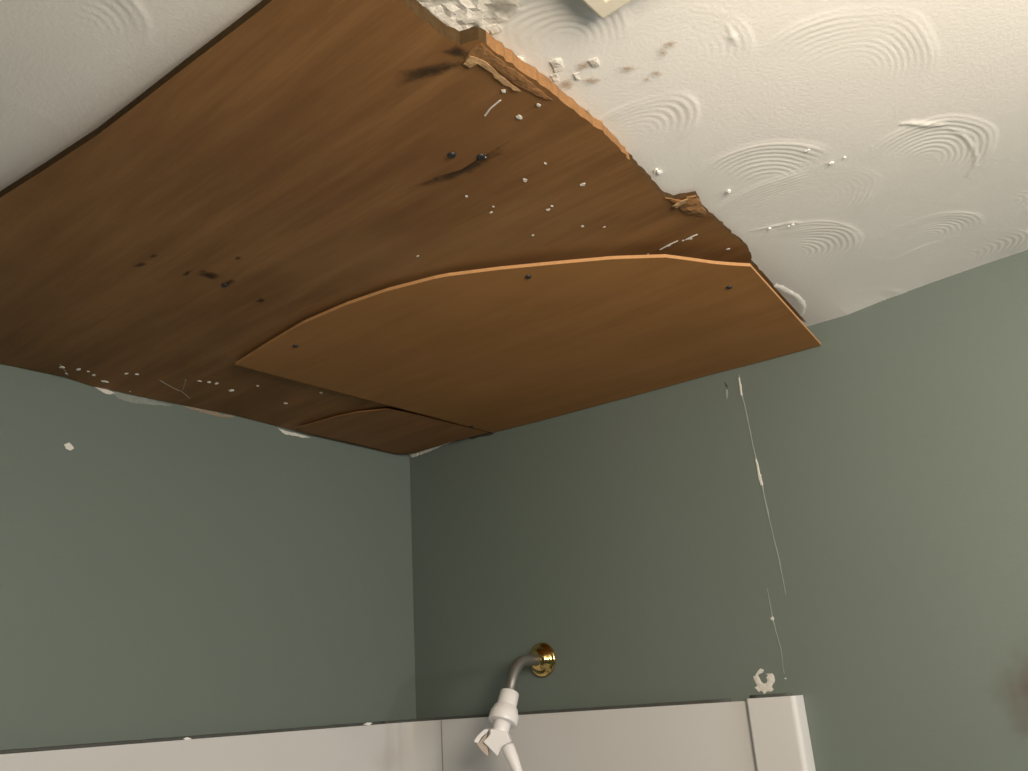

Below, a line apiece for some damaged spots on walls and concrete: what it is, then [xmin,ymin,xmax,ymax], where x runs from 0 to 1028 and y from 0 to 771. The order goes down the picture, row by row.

spalling [417,0,519,34]
peeling [59,364,235,418]
crack [739,376,787,679]